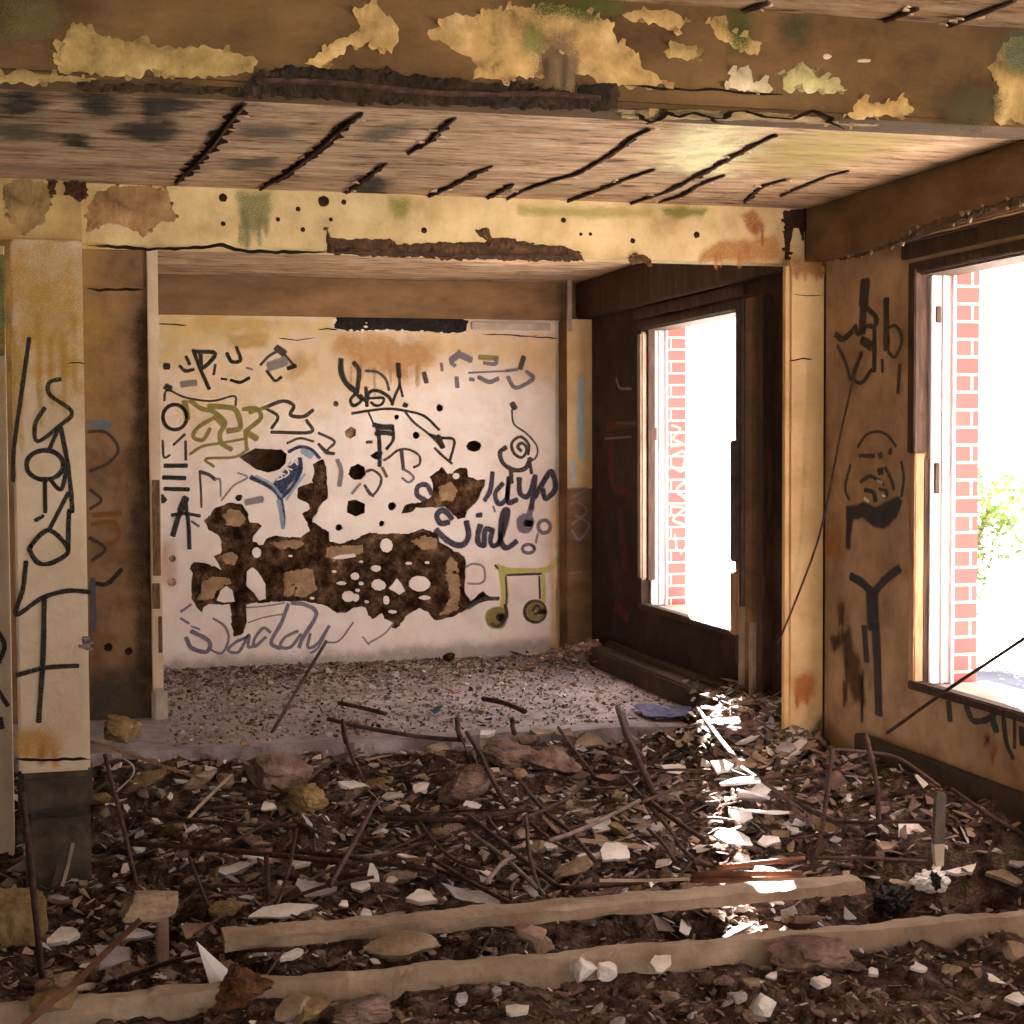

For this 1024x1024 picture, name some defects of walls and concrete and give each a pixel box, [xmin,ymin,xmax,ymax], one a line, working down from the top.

spalling [0,0,920,238]
rust [698,208,826,281]
flaking render [189,459,492,637]